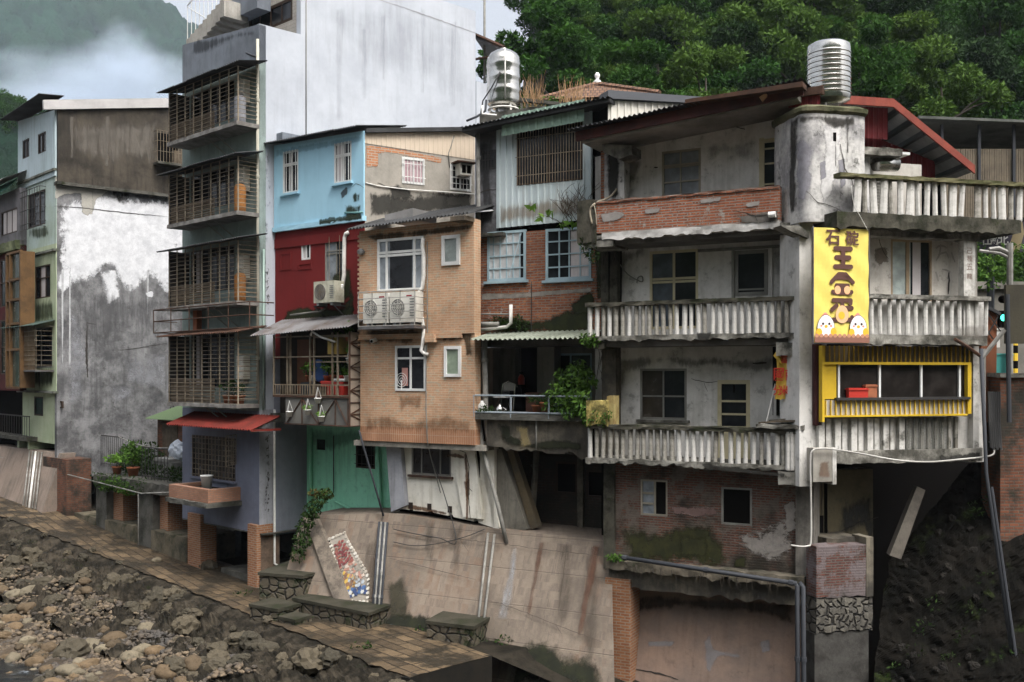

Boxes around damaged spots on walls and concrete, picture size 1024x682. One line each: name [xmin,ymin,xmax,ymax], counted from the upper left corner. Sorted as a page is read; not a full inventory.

water stain [319,185,470,224]